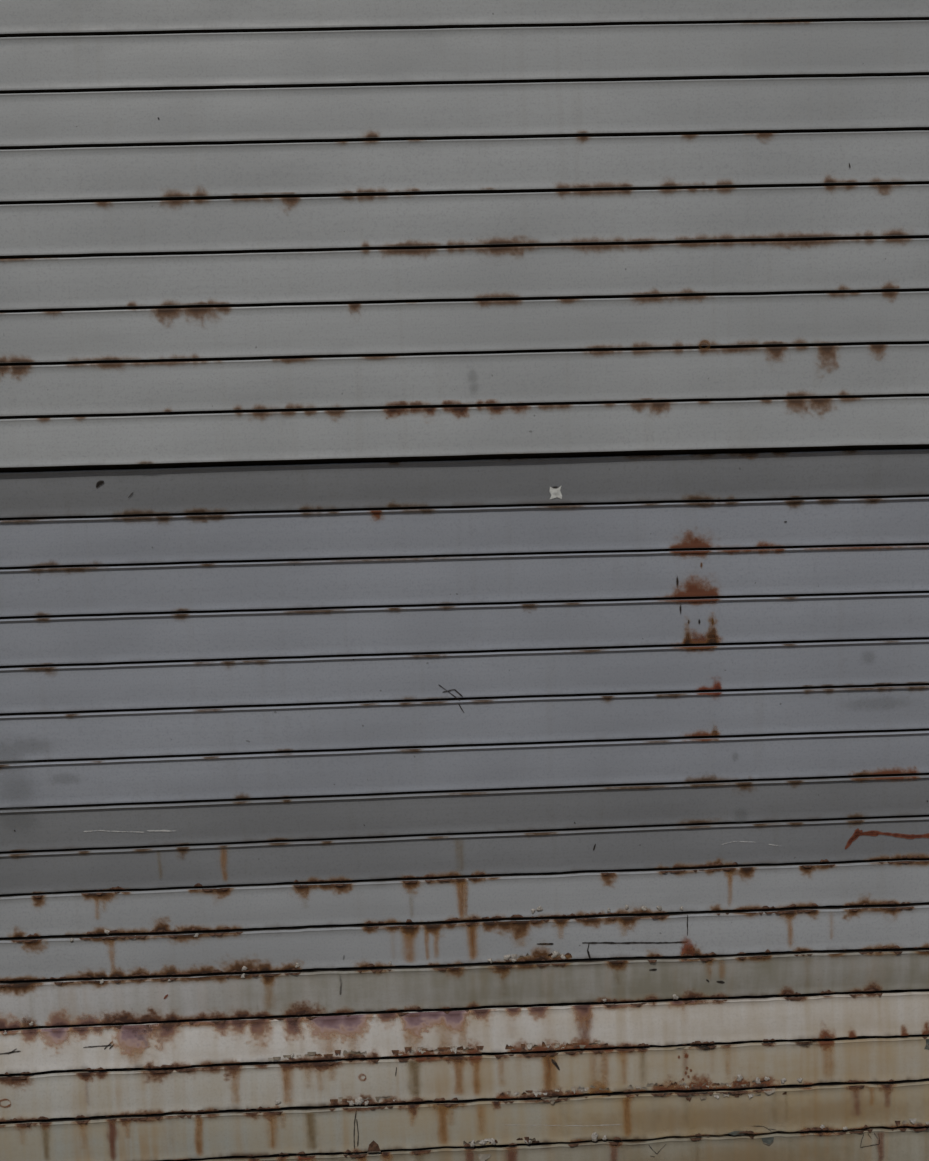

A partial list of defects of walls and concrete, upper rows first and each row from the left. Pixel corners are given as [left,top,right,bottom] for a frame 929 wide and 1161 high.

corrosion [362,238,541,254]
corrosion [384,400,569,417]
corrosion [659,532,784,650]
corrosion [658,859,755,884]
corrosion [293,878,352,897]
corrosion [844,899,914,919]
corrosion [79,922,242,942]
corrosion [358,872,670,976]
corrosion [711,903,819,956]
corrosion [0,960,302,995]
corrosion [781,987,807,1001]
corrosion [0,991,776,1161]